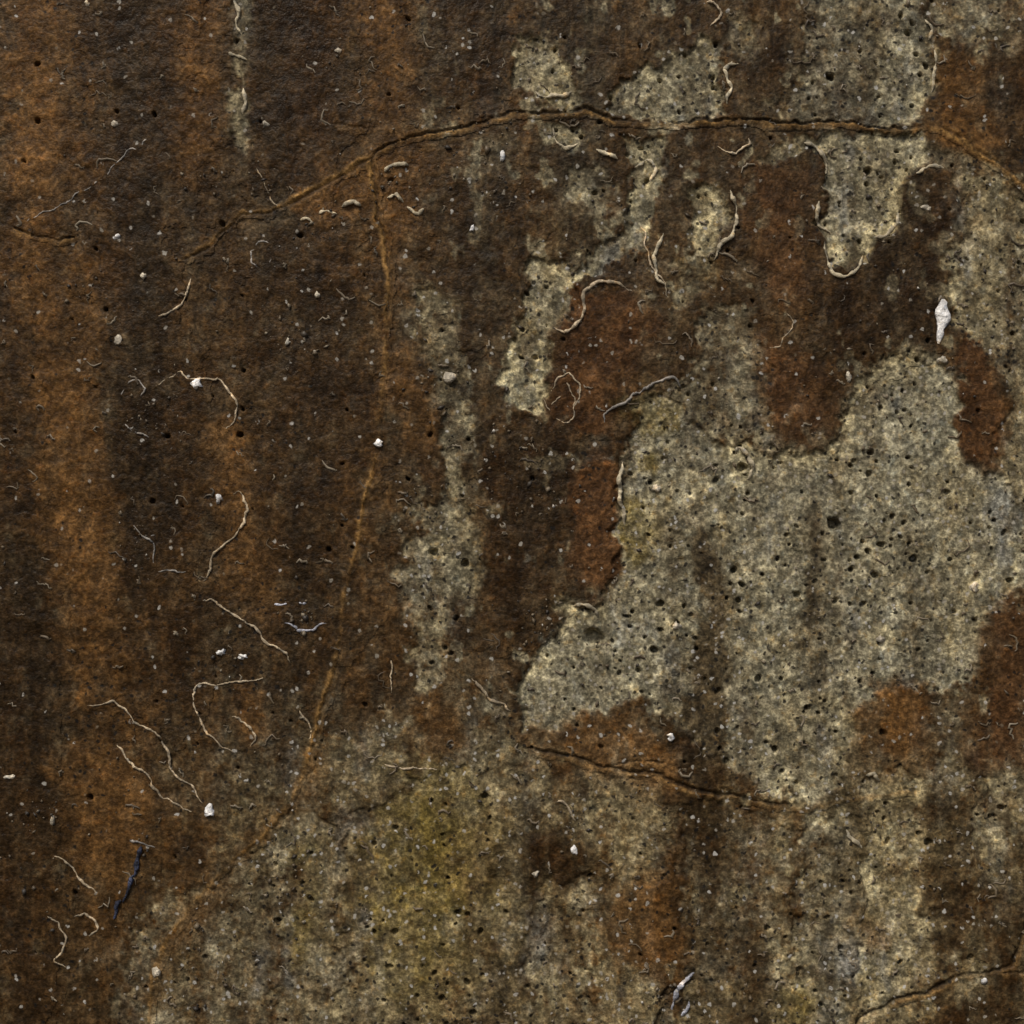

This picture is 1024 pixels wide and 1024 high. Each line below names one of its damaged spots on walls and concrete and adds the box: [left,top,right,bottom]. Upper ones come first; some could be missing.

crack [10,226,79,246]
rust [0,0,129,716]
rust [196,407,286,646]
rust [300,0,436,259]
rust [373,333,448,493]
crack [145,102,1024,1024]
rust [513,259,675,613]
rust [721,129,849,466]
rust [945,329,1016,480]
rust [230,676,278,751]
rust [838,572,1024,794]
rust [54,731,174,964]